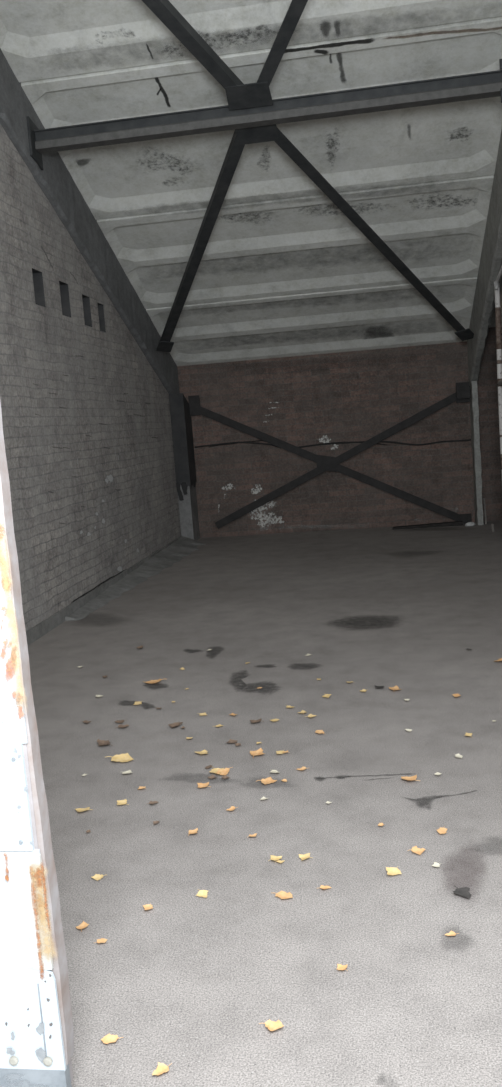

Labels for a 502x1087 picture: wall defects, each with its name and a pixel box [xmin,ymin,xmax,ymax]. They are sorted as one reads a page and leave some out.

crack [146,44,170,107]
damp [284,21,373,82]
damp [387,27,502,39]
efflorescence [249,484,284,531]
corrosion [0,524,24,719]
corrosion [30,864,55,979]